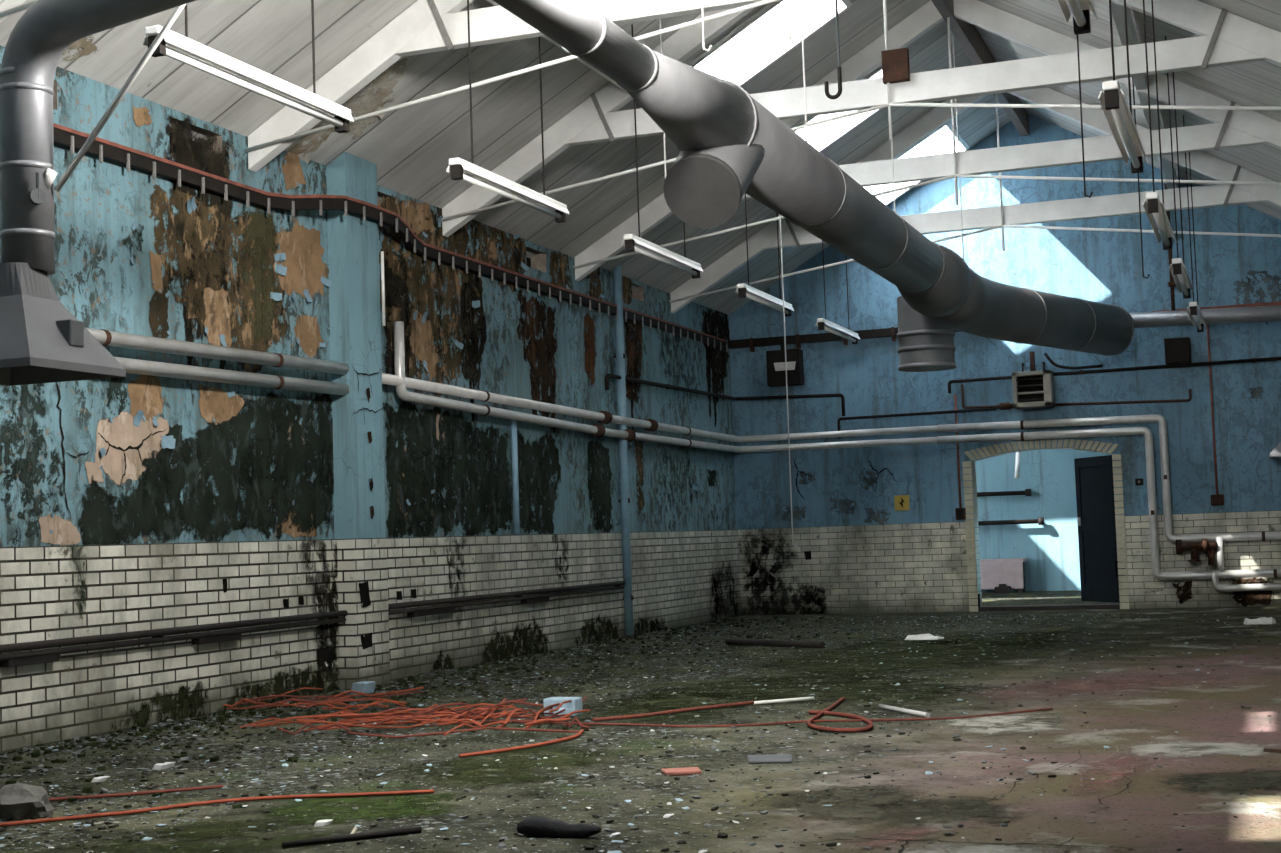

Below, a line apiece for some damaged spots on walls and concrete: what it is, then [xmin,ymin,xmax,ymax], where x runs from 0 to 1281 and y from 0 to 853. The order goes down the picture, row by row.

flaking render [85,374,176,485]
leakage [69,391,339,693]
flaking render [199,383,244,425]
peeling [122,184,332,373]
peeling [378,194,529,440]
leakage [383,269,569,625]